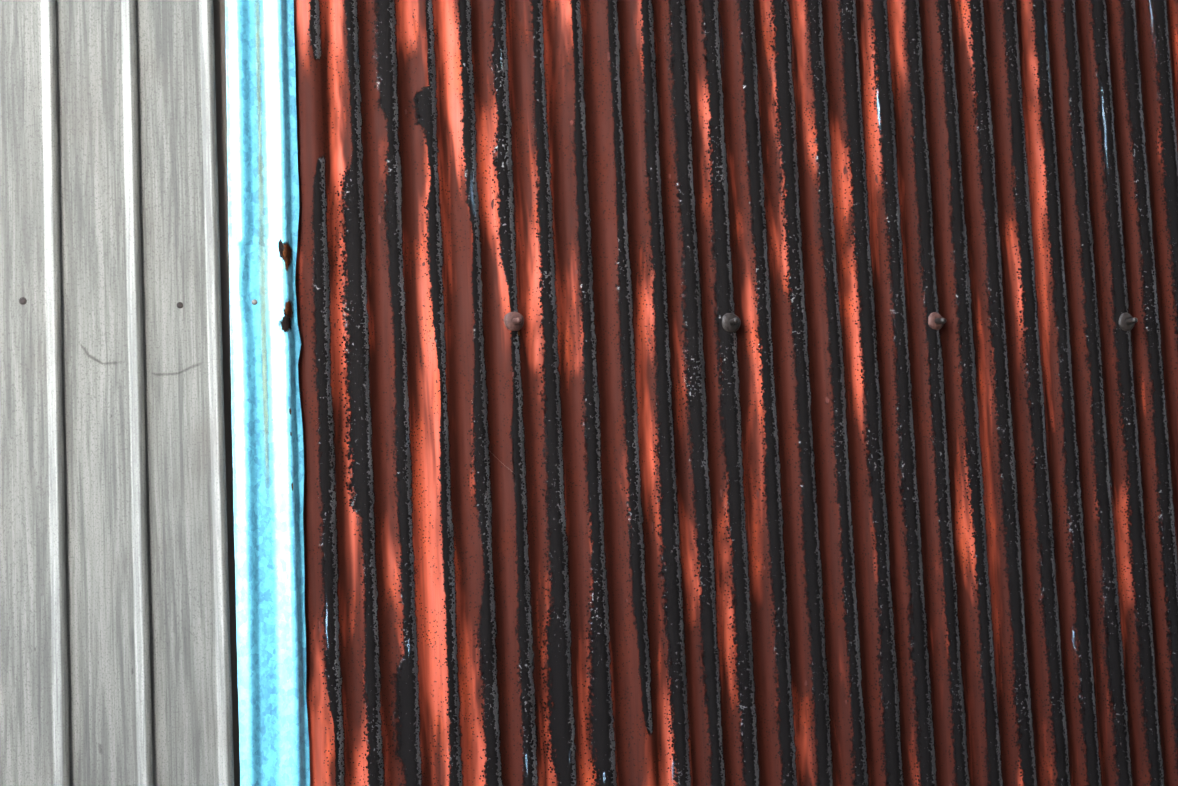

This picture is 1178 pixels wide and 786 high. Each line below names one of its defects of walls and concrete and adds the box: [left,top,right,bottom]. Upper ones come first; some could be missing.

rust [278,238,292,271]
rust [283,299,293,319]